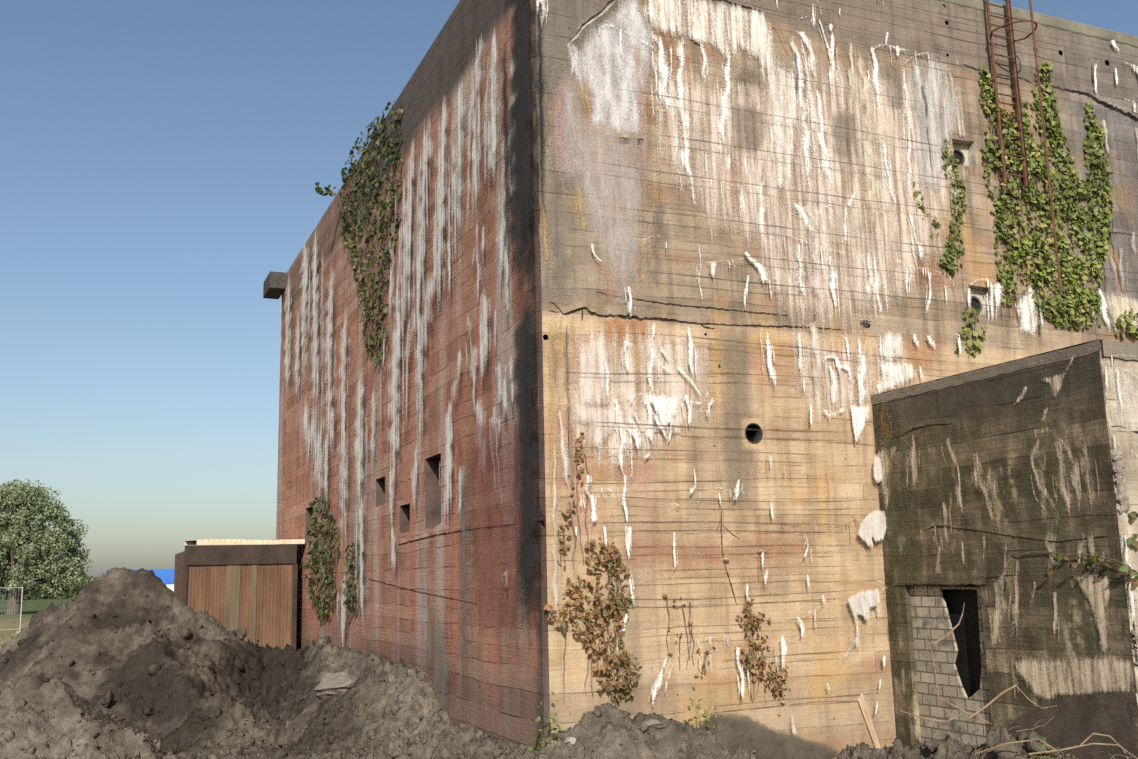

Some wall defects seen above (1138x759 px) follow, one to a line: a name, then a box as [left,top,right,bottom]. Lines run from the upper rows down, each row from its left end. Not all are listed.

crack [963,64,1138,122]
water stain [280,0,714,651]
water stain [563,0,965,656]
crack [548,292,846,485]
water stain [1106,355,1138,422]
water stain [974,455,995,518]
water stain [988,547,1036,644]
water stain [1012,535,1138,700]
water stain [698,636,750,697]